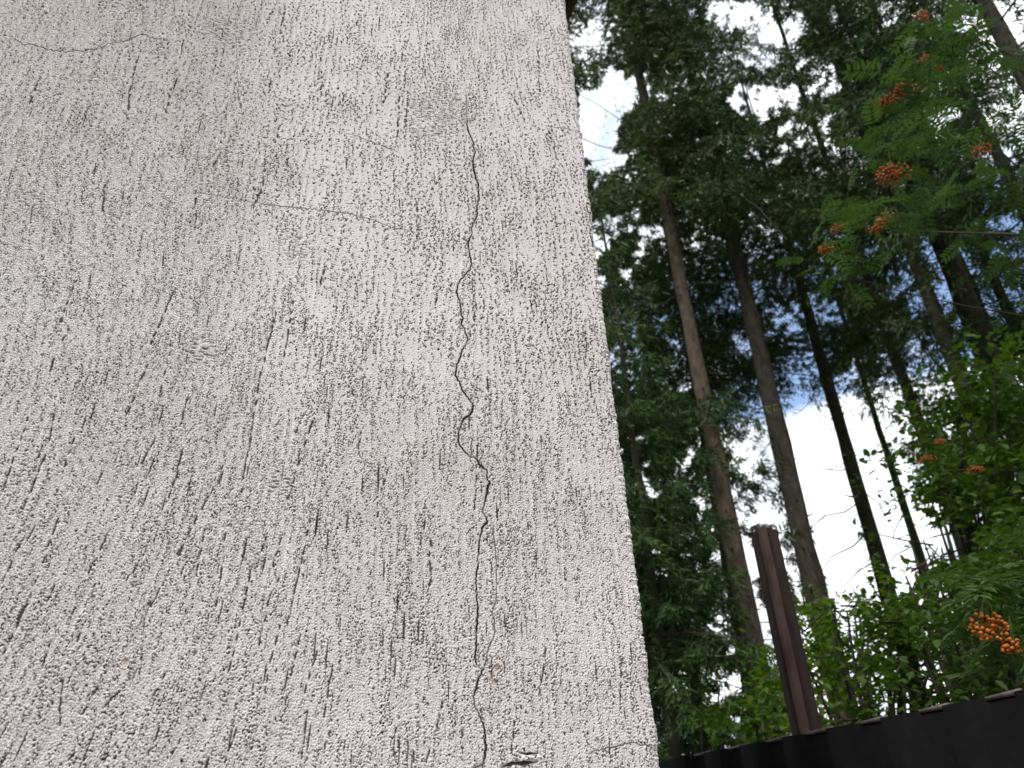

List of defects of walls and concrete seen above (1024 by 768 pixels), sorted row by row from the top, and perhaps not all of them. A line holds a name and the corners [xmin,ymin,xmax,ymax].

crack [454,96,497,768]